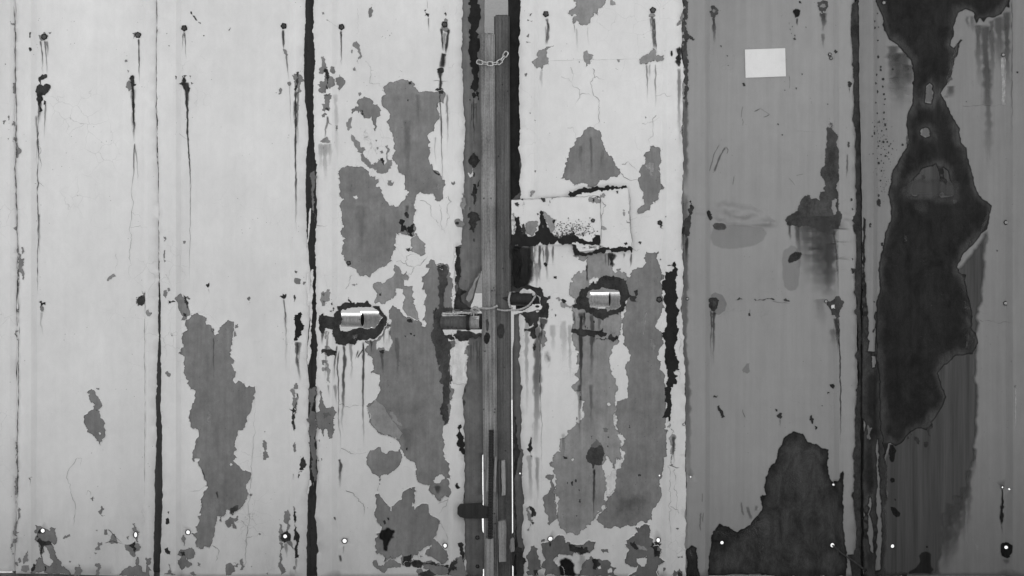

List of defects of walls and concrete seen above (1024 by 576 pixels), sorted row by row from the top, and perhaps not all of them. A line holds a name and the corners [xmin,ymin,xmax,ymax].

rust [35,74,51,112]
rust [125,32,140,130]
rust [175,75,193,253]
peeling [560,126,621,203]
peeling [623,144,665,223]
peeling [83,388,107,445]
peeling [163,276,257,576]
peeling [294,269,337,442]
rust [318,297,391,414]
peeling [318,41,469,576]
peeling [526,252,683,576]
rust [686,0,1010,576]